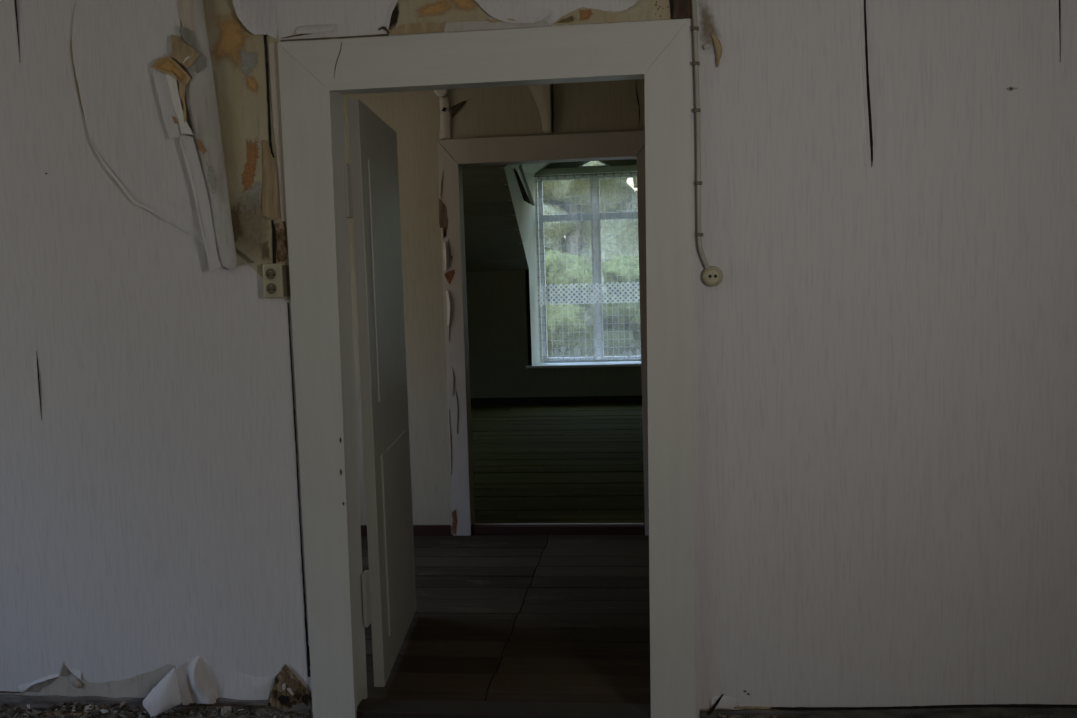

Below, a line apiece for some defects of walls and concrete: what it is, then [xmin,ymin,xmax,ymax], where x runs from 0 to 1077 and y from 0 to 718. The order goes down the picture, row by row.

crack [9,0,20,59]
flaking render [387,0,490,35]
flaking render [551,0,671,25]
crack [1054,0,1062,61]
crack [859,0,873,167]
flaking render [203,0,291,301]
crack [34,350,42,420]
flaking render [22,663,177,698]
crack [183,701,265,709]
spalling [267,664,312,709]